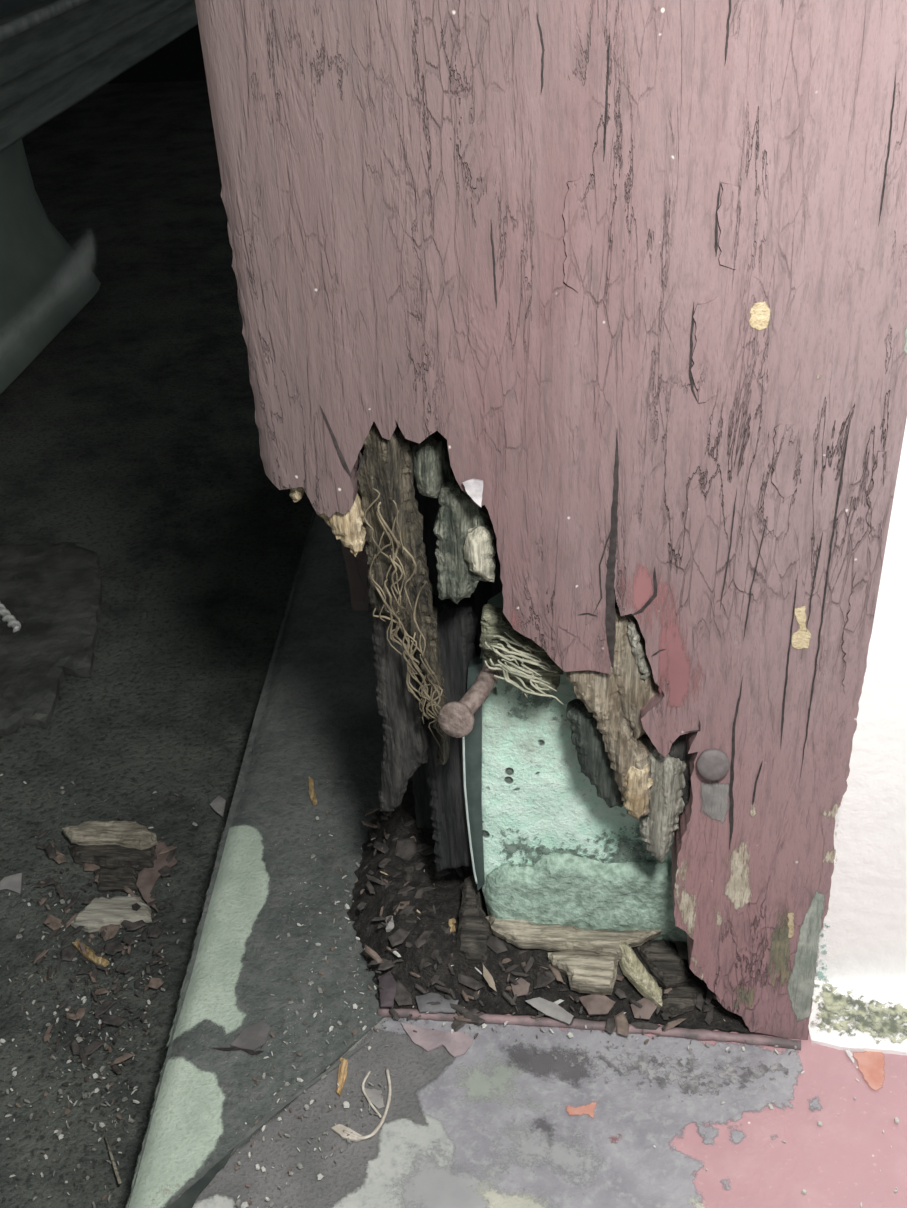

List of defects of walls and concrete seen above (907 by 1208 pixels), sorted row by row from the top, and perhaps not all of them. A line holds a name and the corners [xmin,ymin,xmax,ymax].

crack [603,35,611,156]
crack [878,75,896,226]
crack [689,305,698,401]
peeling [691,296,723,403]
peeling [462,479,484,507]
crack [579,433,657,668]
crack [720,491,767,641]
crack [729,420,851,850]
peeling [701,782,729,823]
peeling [723,841,752,910]
mould [811,923,907,1043]
peeling [361,971,803,1208]